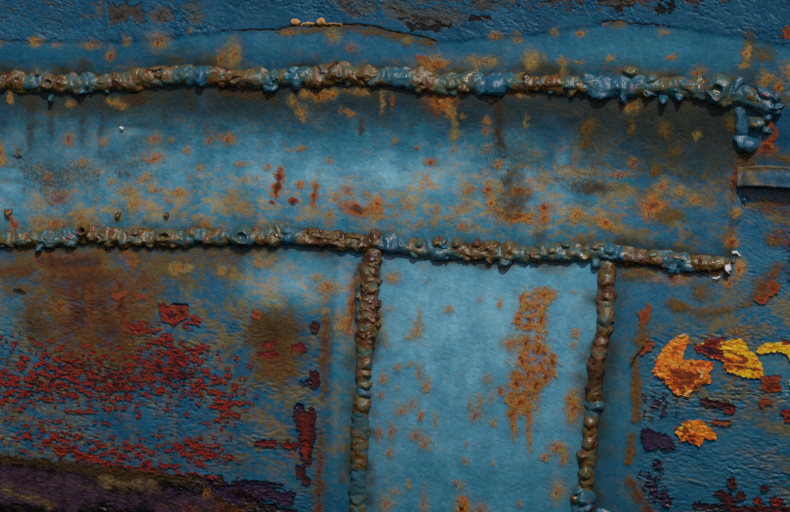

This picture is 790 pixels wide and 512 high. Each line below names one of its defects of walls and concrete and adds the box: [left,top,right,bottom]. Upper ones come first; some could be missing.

crack [220,18,437,42]
peeling [325,0,701,33]
rust [290,89,338,122]
rust [264,164,298,205]
rust [326,185,412,225]
rust [463,160,551,224]
rust [641,164,699,222]
peeling [753,229,790,304]
rust [468,286,562,451]
peeling [0,303,297,512]
peeling [254,403,317,487]
peeling [629,333,790,512]